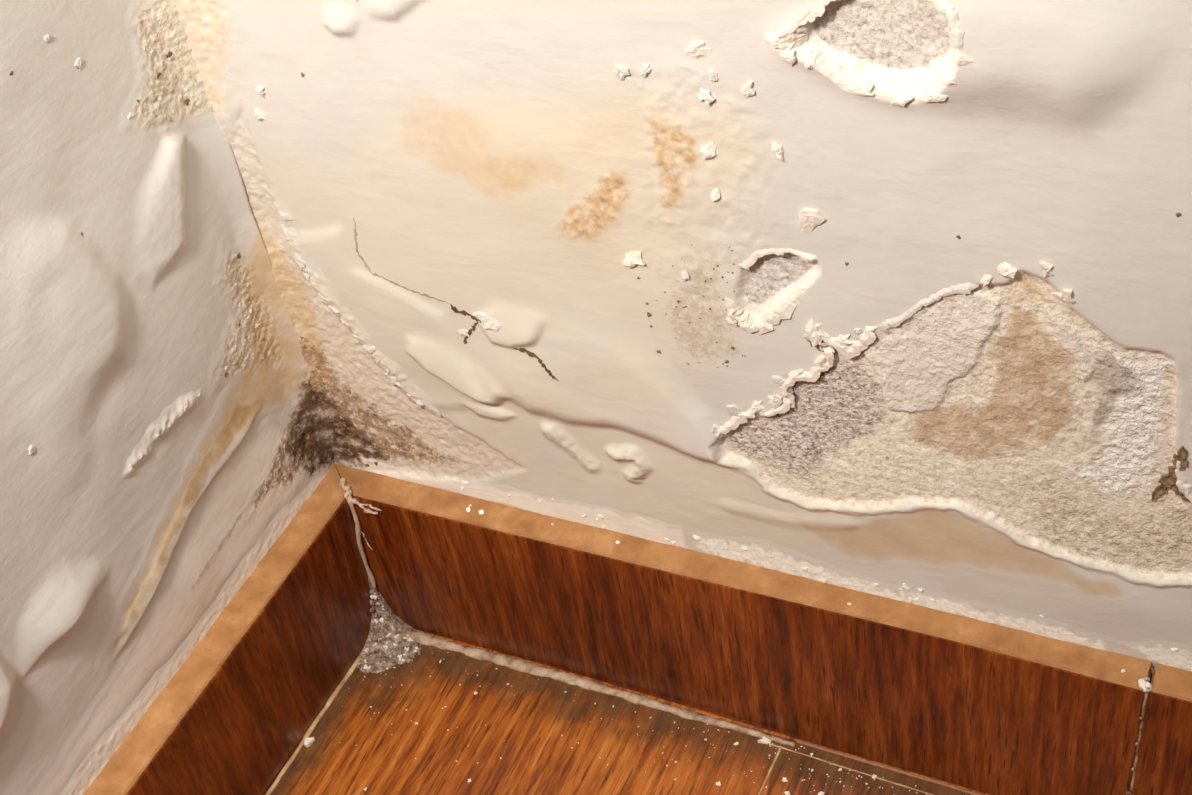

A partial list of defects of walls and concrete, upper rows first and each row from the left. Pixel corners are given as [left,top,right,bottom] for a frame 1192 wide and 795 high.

water stain [173,0,251,128]
spalling [764,0,975,107]
water stain [371,29,807,387]
crack [353,218,484,344]
spalling [725,248,824,335]
crack [514,348,559,381]
spalling [706,261,1192,590]
crack [1151,446,1189,502]
water stain [33,307,1192,795]